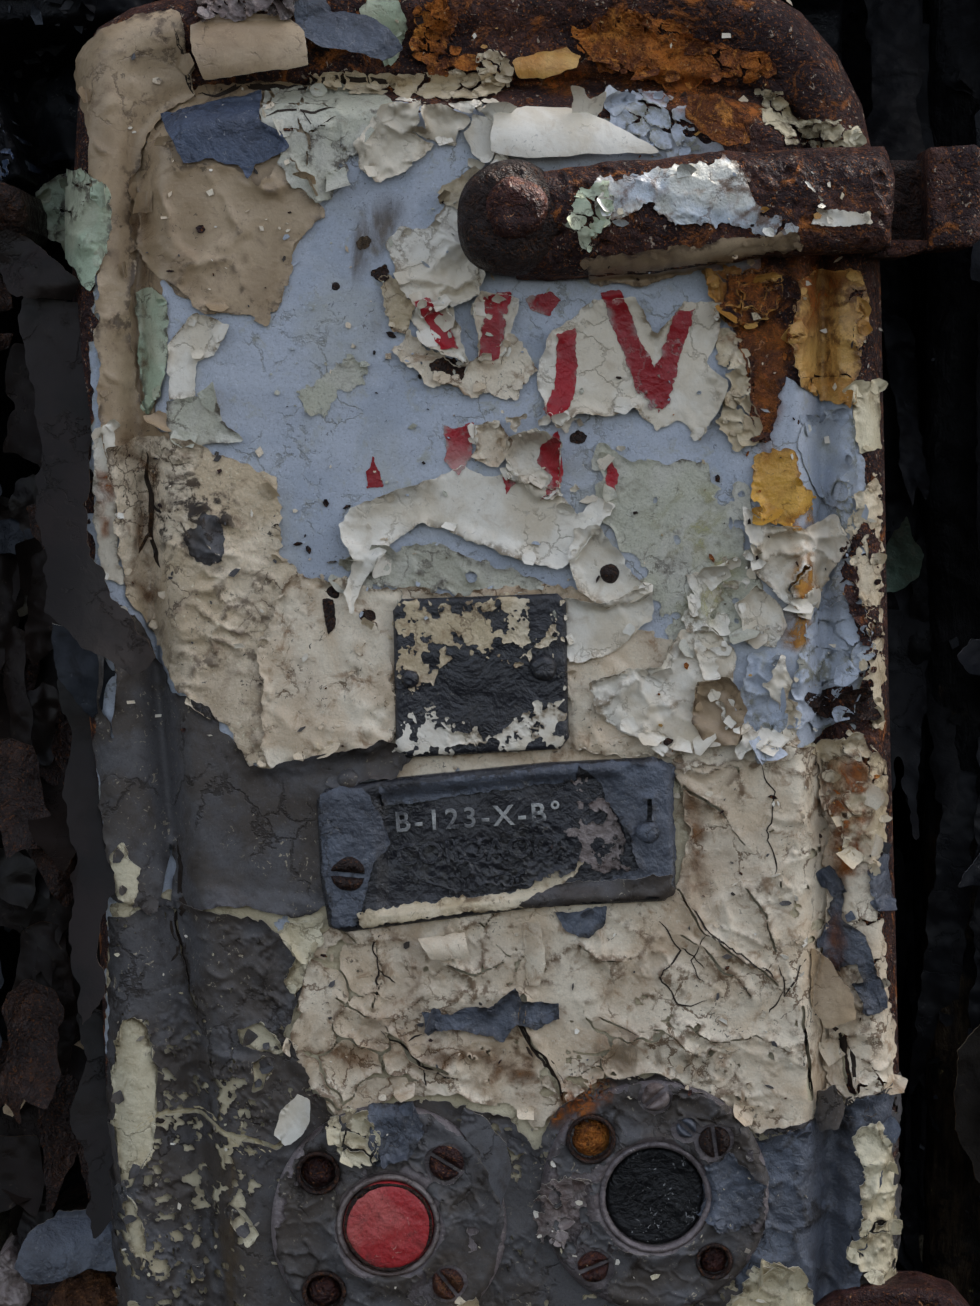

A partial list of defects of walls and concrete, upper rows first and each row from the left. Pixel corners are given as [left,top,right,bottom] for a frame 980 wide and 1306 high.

corrosion [409,0,480,77]
corrosion [532,7,777,123]
peeling [754,0,935,160]
peeling [805,181,873,227]
corrosion [720,262,848,443]
peeling [0,0,804,1271]
peeling [238,257,980,1306]
crack [762,767,777,878]
crack [659,893,856,1096]